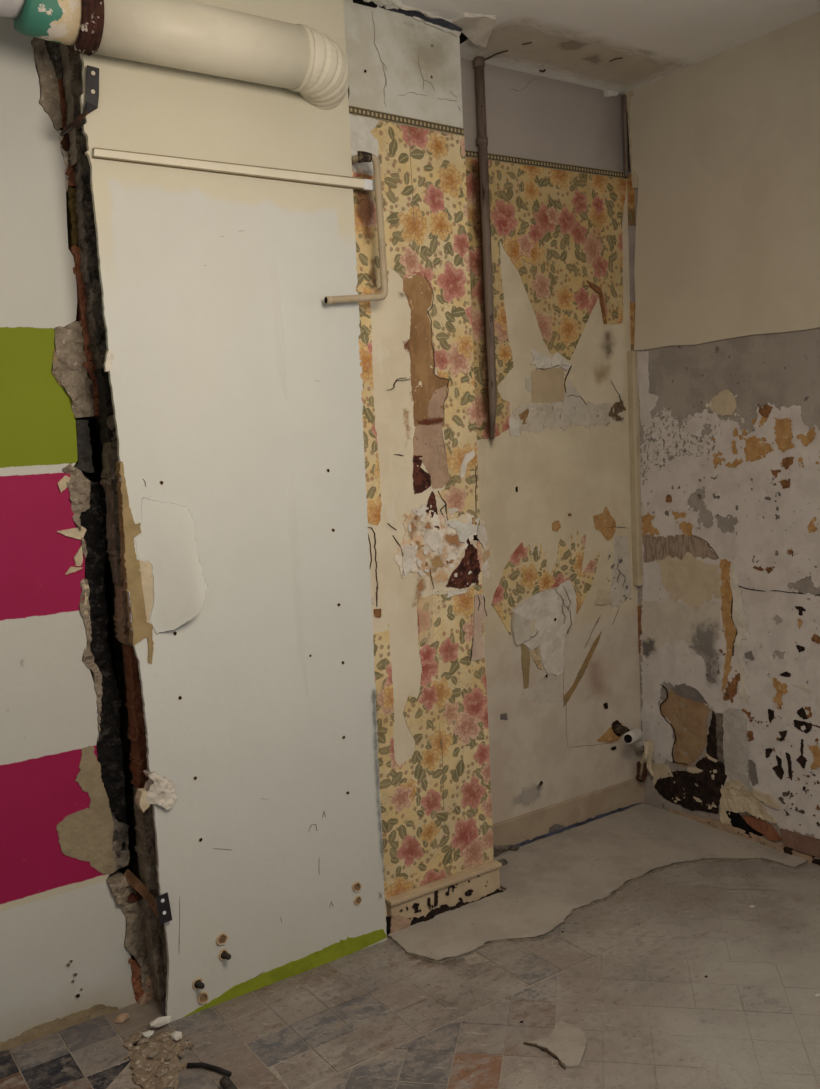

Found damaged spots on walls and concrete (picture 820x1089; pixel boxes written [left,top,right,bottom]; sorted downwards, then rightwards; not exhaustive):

crack [371,10,461,111]
flaking render [349,114,379,176]
flaking render [628,225,636,302]
flaking render [511,349,626,435]
spalling [402,274,489,598]
peeling [139,560,154,621]
peeling [511,580,577,678]
peeling [610,351,820,839]
peeling [56,745,116,874]
spalling [667,809,820,867]
peeling [427,889,450,909]